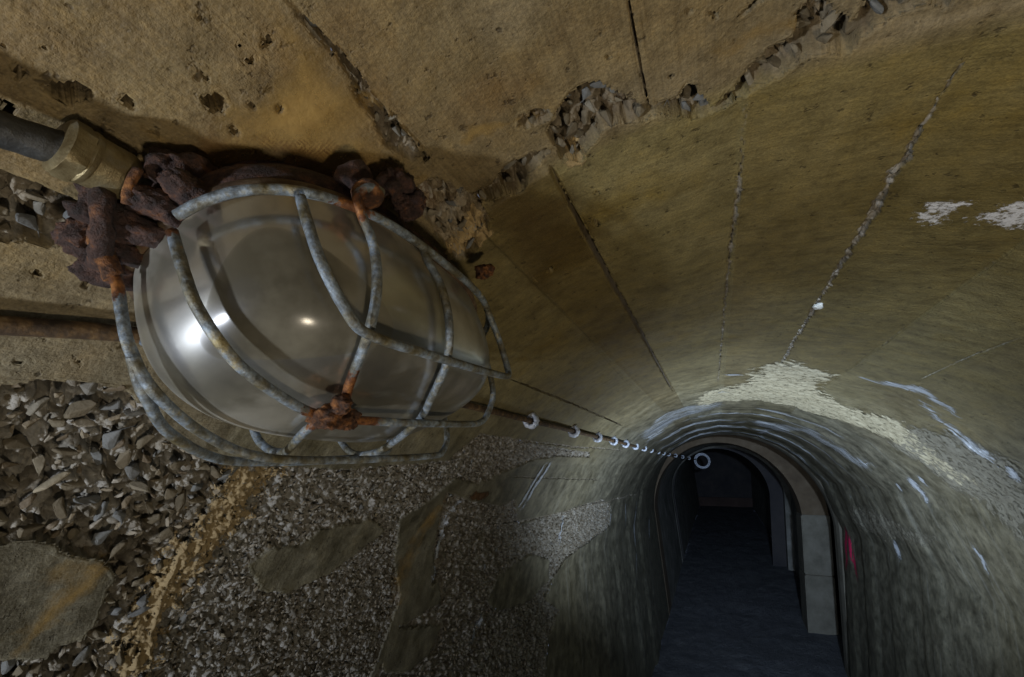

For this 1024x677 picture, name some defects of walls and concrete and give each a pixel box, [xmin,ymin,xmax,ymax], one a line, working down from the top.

crack [276,0,434,163]
spalling [284,0,963,265]
crack [779,57,976,364]
damp [918,201,1024,230]
damp [643,392,875,494]
damp [896,477,928,503]
damp [861,377,1021,483]